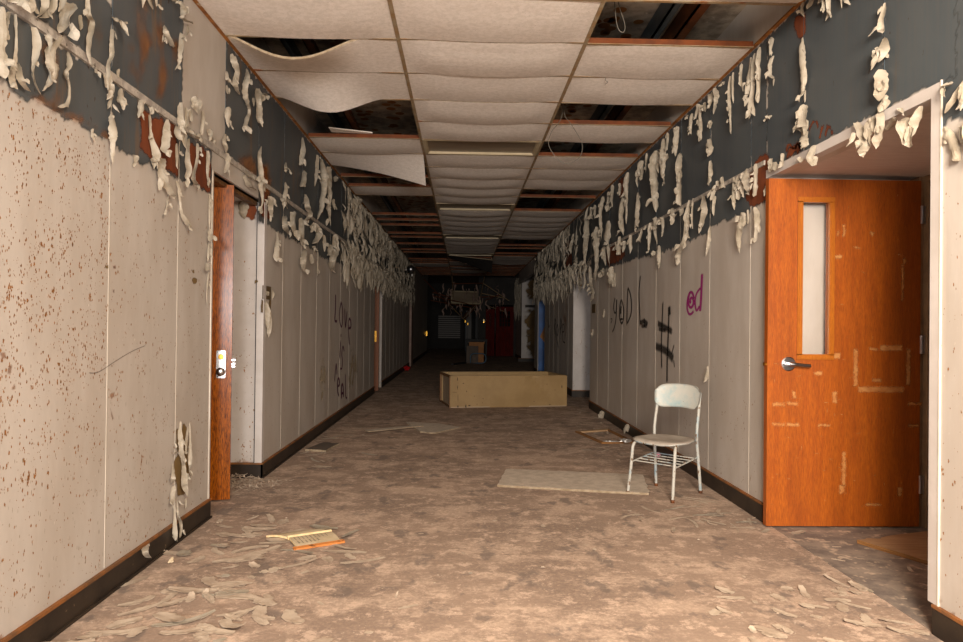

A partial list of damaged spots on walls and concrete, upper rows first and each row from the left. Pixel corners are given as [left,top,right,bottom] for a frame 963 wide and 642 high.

rust [0,90,169,574]
rust [140,110,211,193]
peeling [170,421,193,541]
peeling [0,0,415,309]
peeling [514,0,963,358]
rust [746,154,769,206]